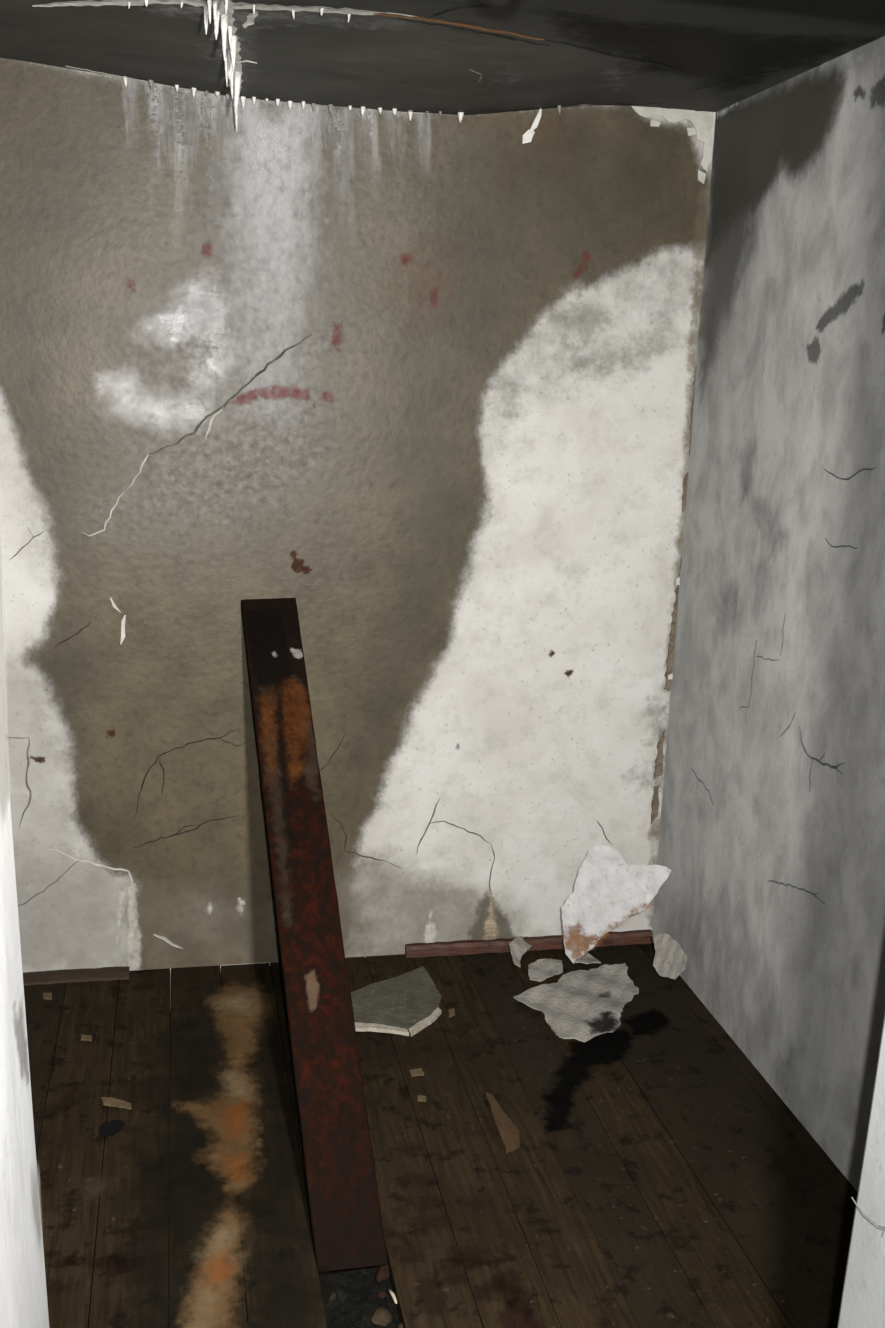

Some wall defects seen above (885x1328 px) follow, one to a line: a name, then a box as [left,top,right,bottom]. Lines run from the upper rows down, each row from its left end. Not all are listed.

crack [81,334,312,536]
spalling [689,365,697,456]
crack [10,527,44,560]
water stain [0,18,885,971]
spalling [664,558,682,691]
crack [9,729,247,906]
crack [330,799,495,899]
spalling [651,730,665,824]
crack [767,880,826,905]
rust [185,986,271,1190]
rust [188,1211,239,1328]